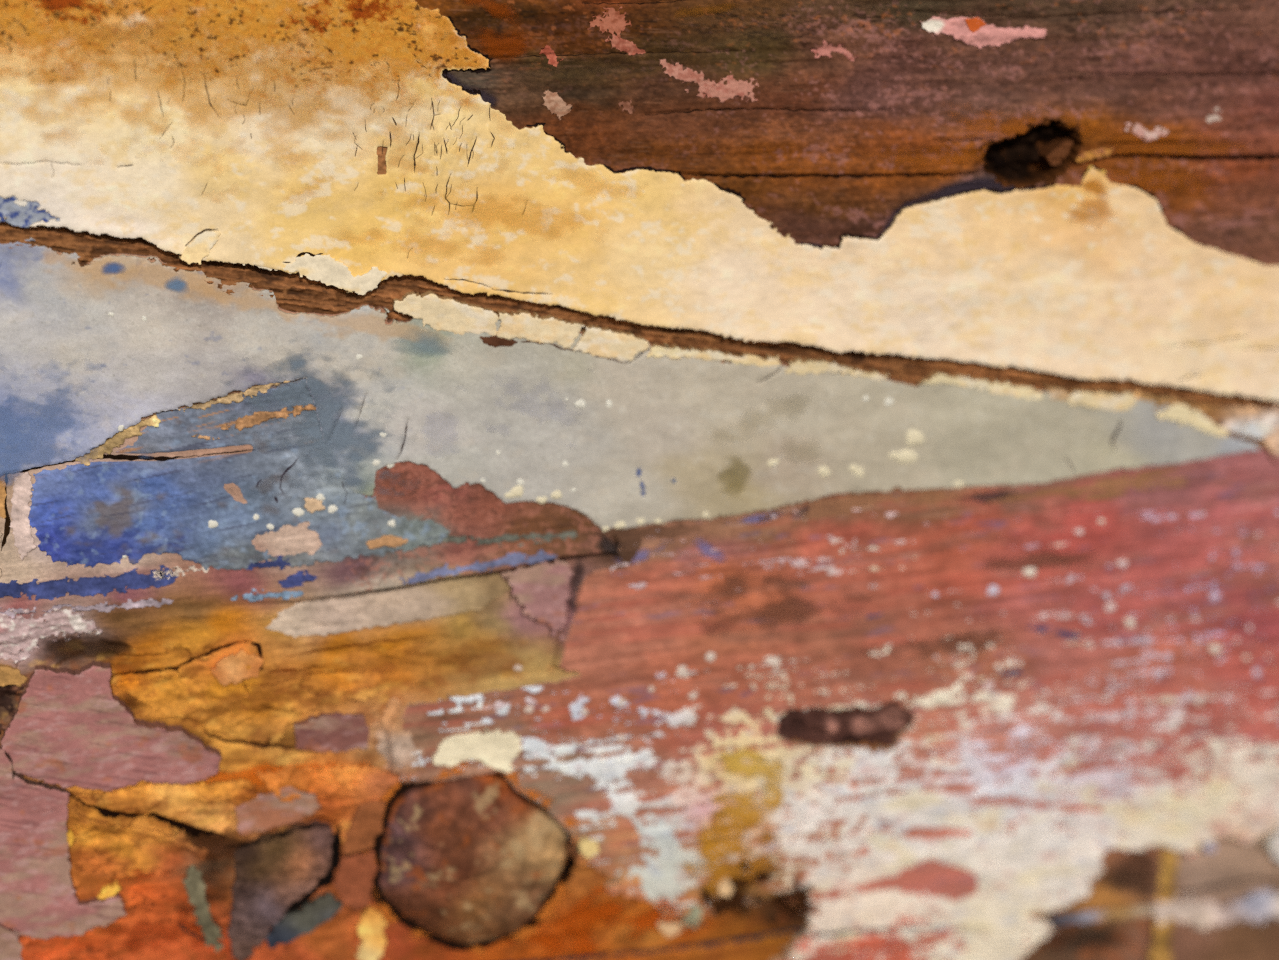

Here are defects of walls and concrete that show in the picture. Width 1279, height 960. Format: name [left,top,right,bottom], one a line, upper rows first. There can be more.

crack [584,0,686,8]
crack [645,107,893,115]
crack [682,138,992,179]
crack [1072,142,1279,166]
peeling [0,0,1279,402]
peeling [0,237,1279,960]